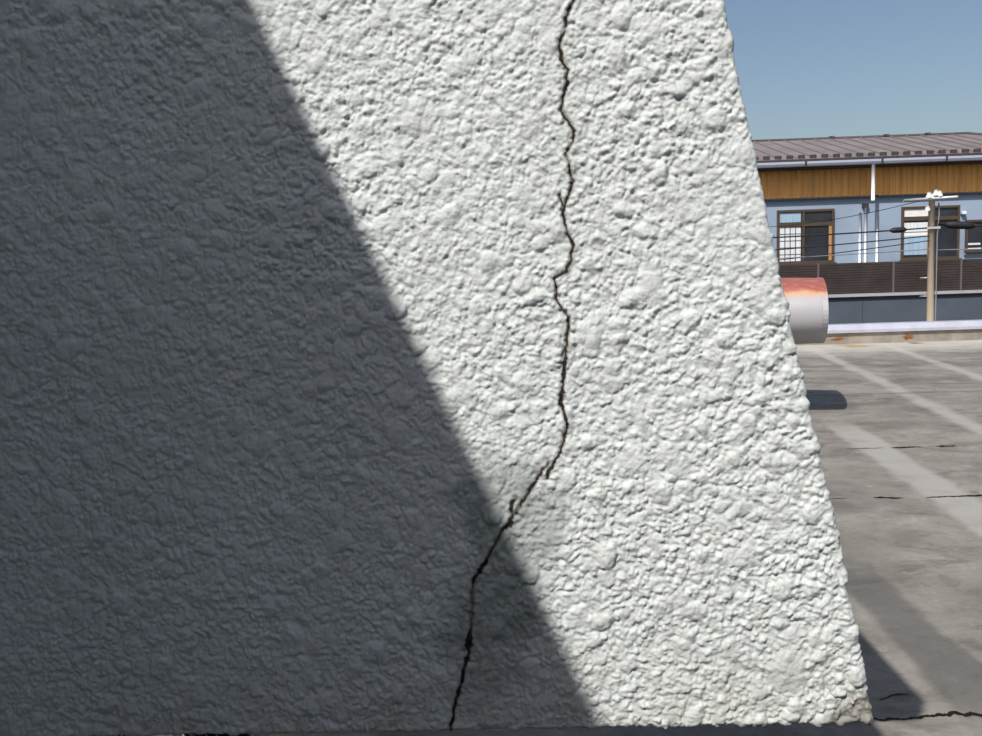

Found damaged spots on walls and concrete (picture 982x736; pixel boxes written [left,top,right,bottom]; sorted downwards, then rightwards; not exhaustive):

crack [449,0,575,732]